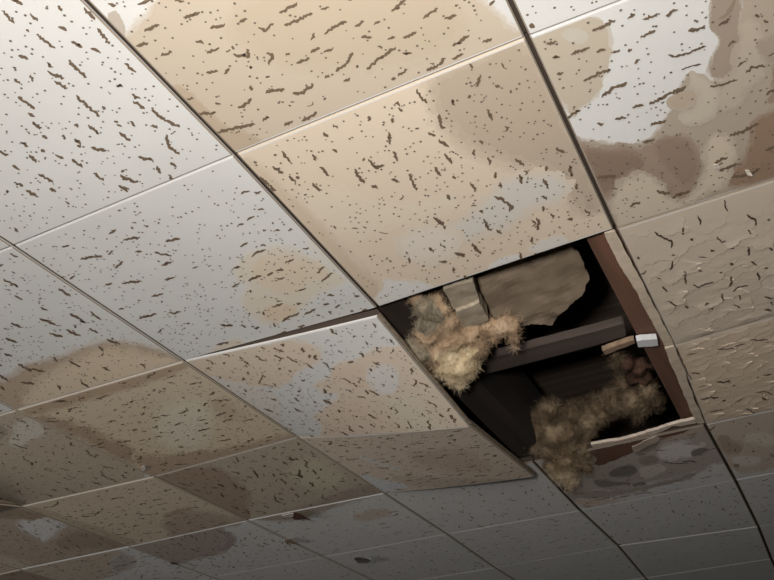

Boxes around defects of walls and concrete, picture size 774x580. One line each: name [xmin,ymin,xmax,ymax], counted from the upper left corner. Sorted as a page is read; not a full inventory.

water stain [108,0,774,329]
peeling [374,278,434,305]
peeling [488,235,569,269]
crack [637,214,773,311]
crack [677,348,772,413]
water stain [0,338,533,580]
spalling [591,429,690,466]
water stain [563,411,774,508]